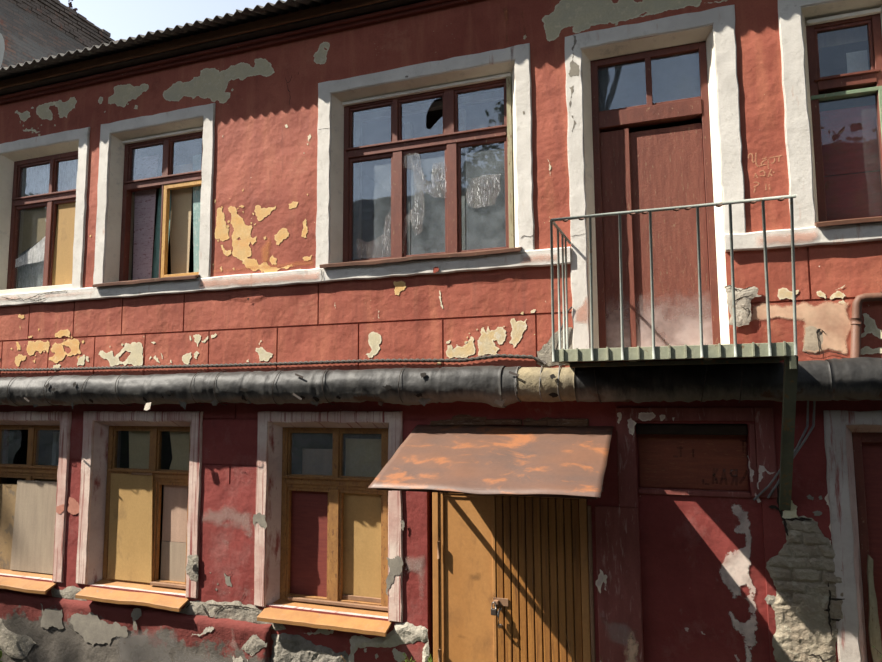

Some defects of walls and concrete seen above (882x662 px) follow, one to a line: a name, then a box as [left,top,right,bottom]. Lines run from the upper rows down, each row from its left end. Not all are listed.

peeling [163,58,275,103]
peeling [542,0,728,132]
peeling [212,200,312,273]
peeling [10,329,217,368]
peeling [437,309,536,365]
flaking render [536,327,573,367]
peeling [860,313,882,355]
flaking render [765,494,843,662]
flaking render [0,618,36,659]
peeling [40,586,142,646]
flaking render [169,573,429,662]